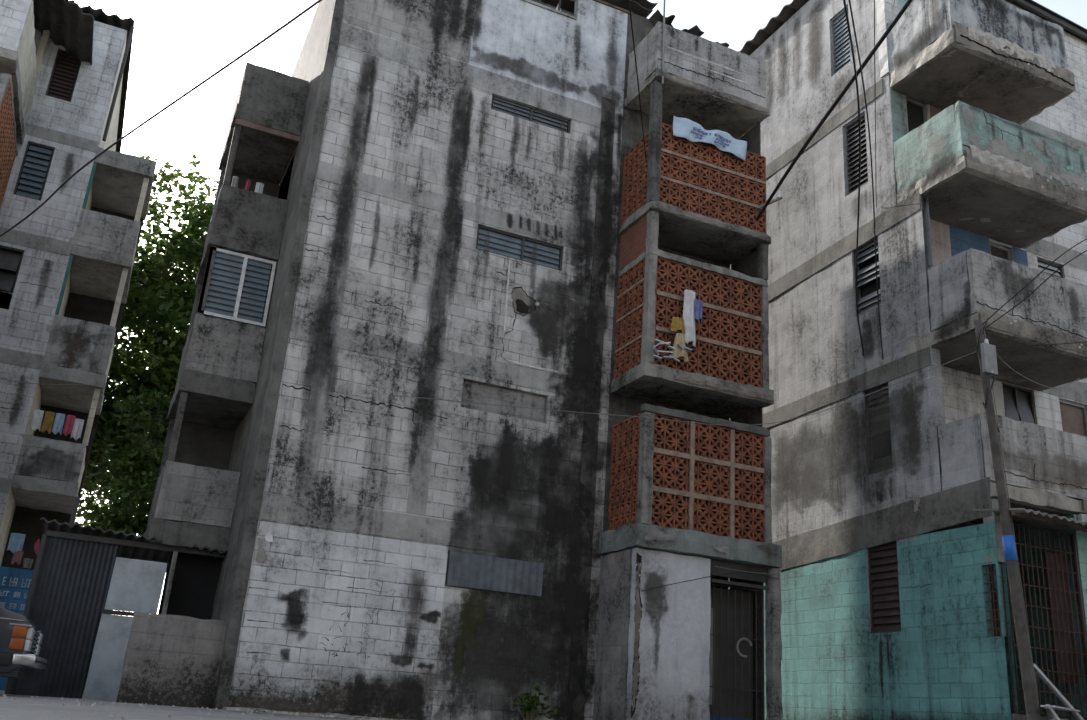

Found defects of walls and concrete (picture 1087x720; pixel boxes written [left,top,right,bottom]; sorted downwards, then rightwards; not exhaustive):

water stain [430,0,482,40]
water stain [607,32,617,77]
spalling [954,21,1076,91]
mould [1018,13,1065,55]
water stain [439,85,485,272]
spalling [962,106,1087,211]
water stain [306,59,375,392]
spalling [508,286,540,317]
crack [976,300,1087,339]
water stain [391,115,629,720]
crack [1005,464,1087,490]
water stain [279,589,306,636]